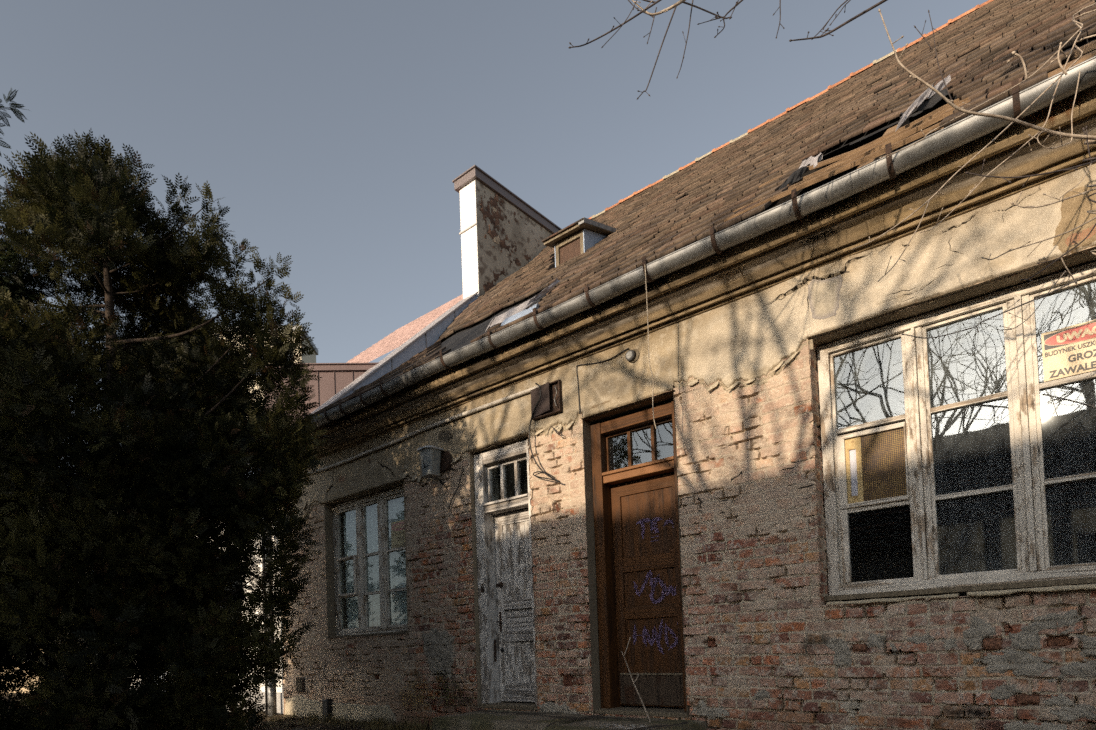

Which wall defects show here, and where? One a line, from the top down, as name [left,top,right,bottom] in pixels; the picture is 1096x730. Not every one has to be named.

spalling [479,191,531,292]
crack [766,251,873,310]
peeling [674,335,813,393]
peeling [527,396,623,438]
spalling [983,625,1009,650]
spalling [1047,636,1071,646]
spalling [1016,695,1040,704]